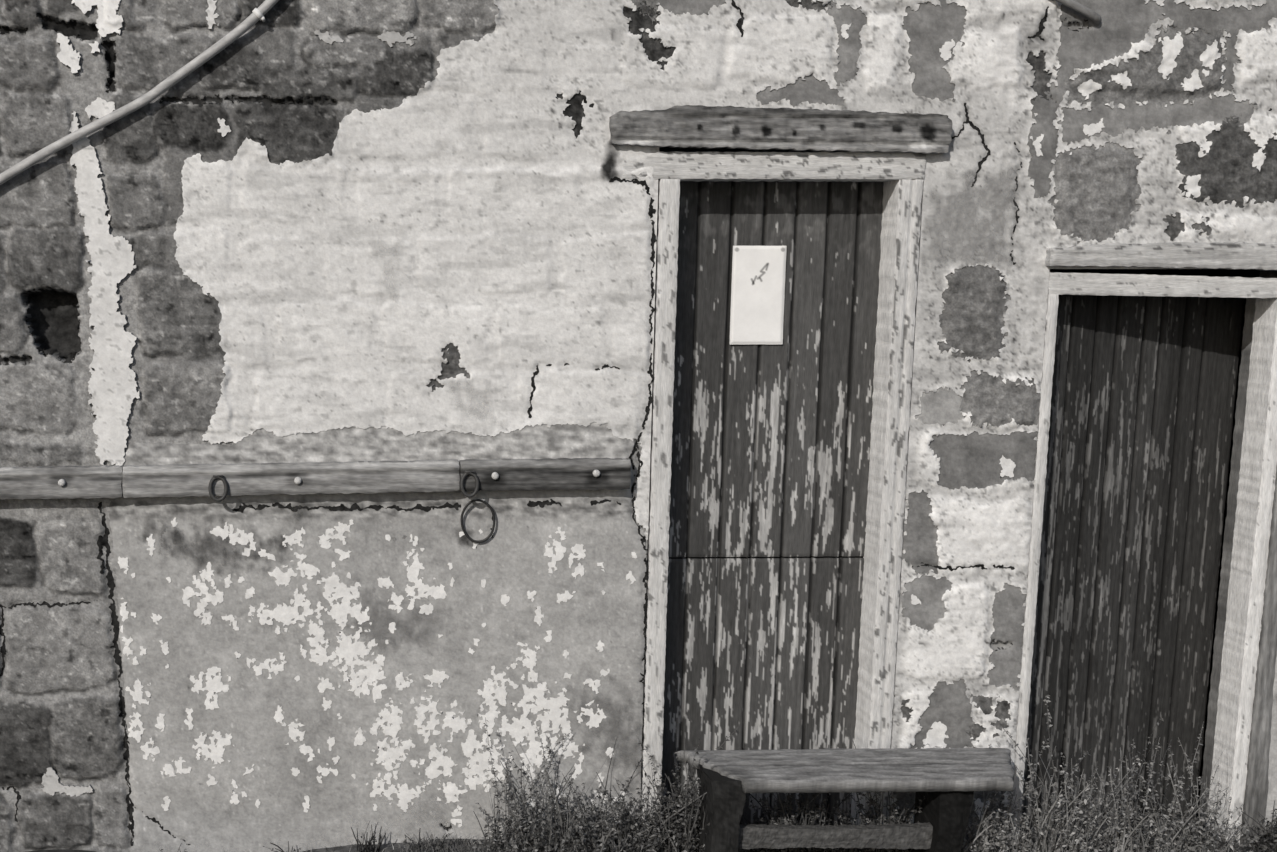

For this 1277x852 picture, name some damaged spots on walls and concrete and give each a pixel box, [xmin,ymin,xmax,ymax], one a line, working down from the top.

peeling [23,97,140,466]
peeling [57,0,124,74]
peeling [902,0,966,102]
crack [951,103,1022,265]
peeling [1026,0,1277,244]
crack [232,502,461,513]
crack [527,176,657,778]
peeling [899,265,1042,632]
crack [0,502,190,846]
peeling [120,597,260,808]
peeling [166,519,610,827]
peeling [900,583,1026,749]